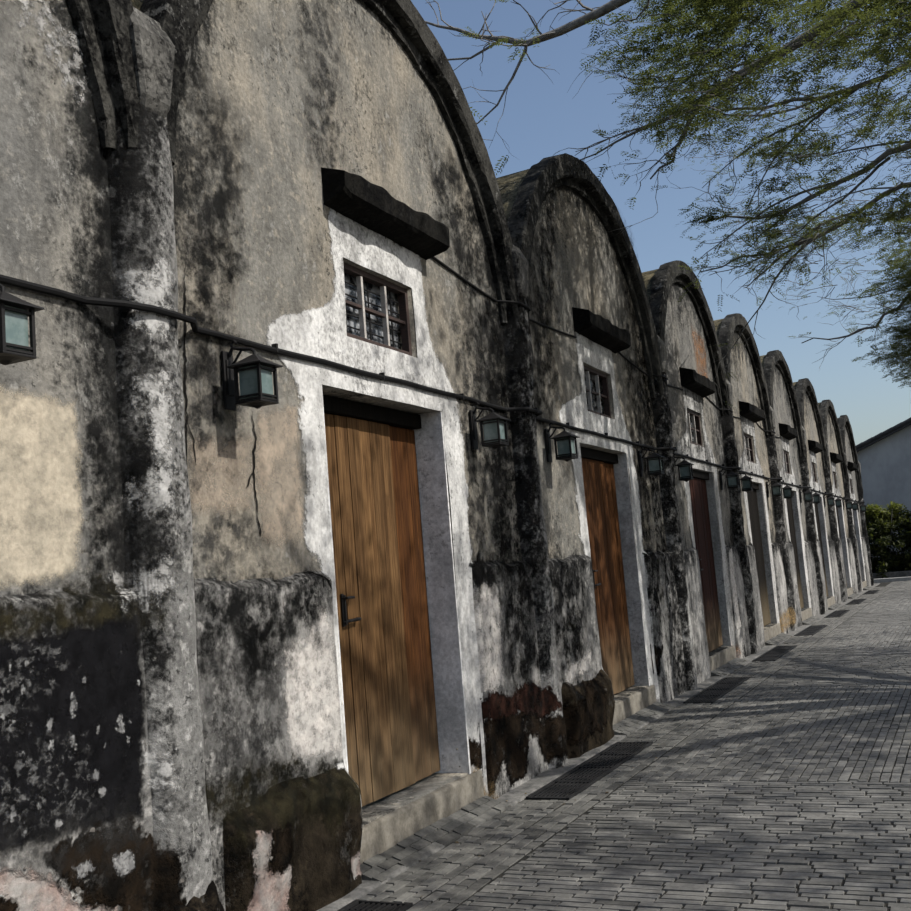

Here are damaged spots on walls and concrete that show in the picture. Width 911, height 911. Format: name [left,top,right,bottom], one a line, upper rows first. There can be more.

leakage [83,109,155,410]
leakage [183,58,244,303]
leakage [86,402,157,600]
leakage [187,339,222,448]
crack [246,415,261,536]
leakage [434,152,587,704]
leakage [617,259,690,692]
leakage [200,573,332,767]
spalling [0,816,188,911]